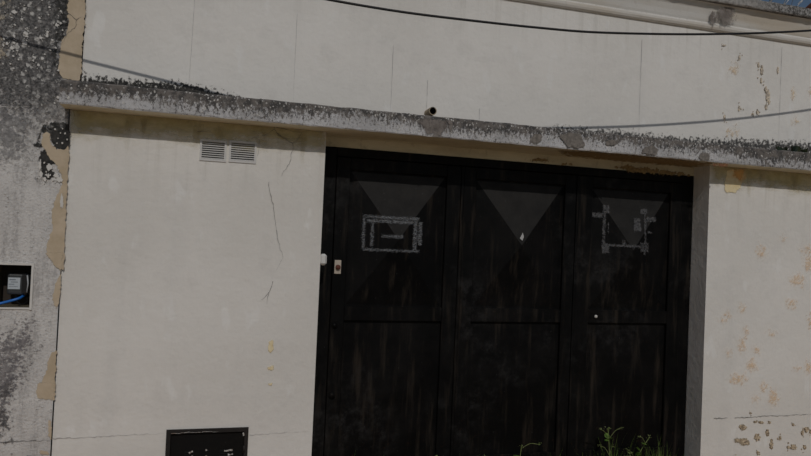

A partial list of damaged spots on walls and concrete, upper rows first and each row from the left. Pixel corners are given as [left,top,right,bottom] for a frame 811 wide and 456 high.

damp [50,0,68,77]
peeling [738,62,771,116]
spalling [559,132,713,177]
flaking render [41,132,70,307]
damp [0,316,42,444]
flaking render [36,351,57,401]
peeling [735,412,811,455]